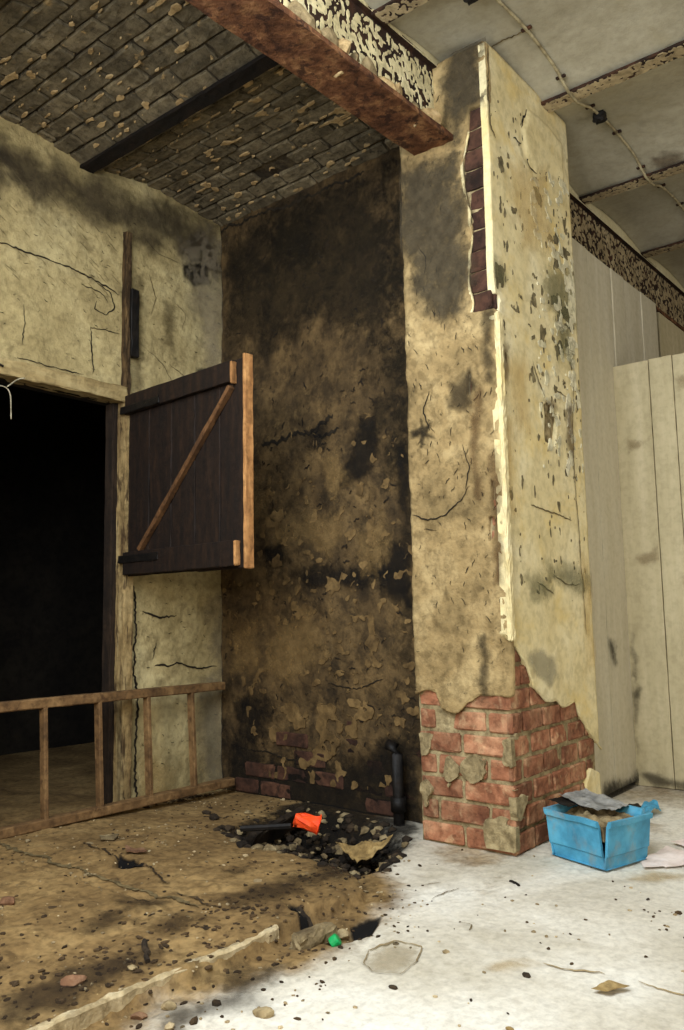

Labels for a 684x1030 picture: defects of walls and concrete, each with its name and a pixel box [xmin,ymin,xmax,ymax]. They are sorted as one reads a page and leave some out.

damp [223,179,432,518]
peeling [460,95,684,485]
damp [221,684,421,823]
damp [296,532,412,619]
spalling [232,508,602,856]